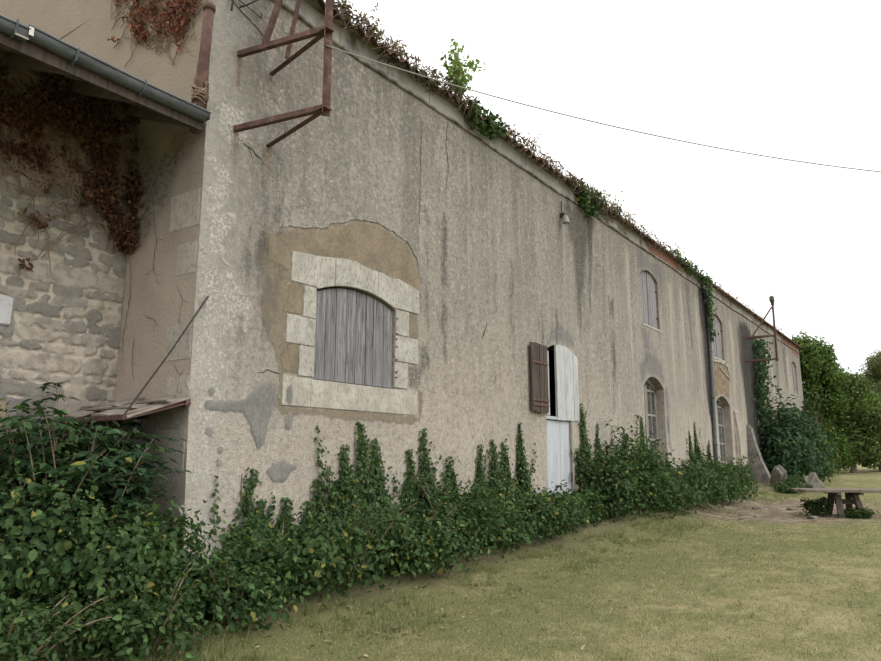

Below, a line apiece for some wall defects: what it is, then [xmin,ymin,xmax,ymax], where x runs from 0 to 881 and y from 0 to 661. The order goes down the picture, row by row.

crack [121,221,187,380]
peeling [254,217,429,424]
leakage [566,201,593,317]
leakage [626,251,712,422]